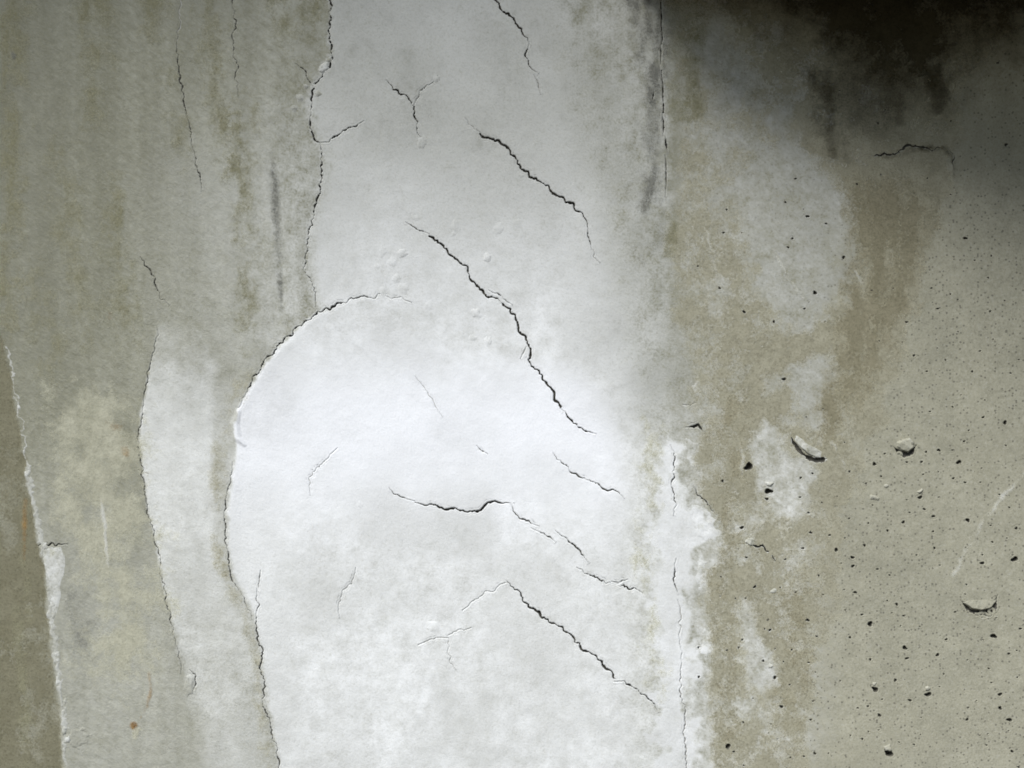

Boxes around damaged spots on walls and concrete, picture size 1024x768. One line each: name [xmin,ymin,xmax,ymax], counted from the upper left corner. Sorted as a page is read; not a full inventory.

water stain [0,0,66,768]
flaking render [5,346,70,767]
water stain [47,386,179,682]
water stain [191,0,259,244]
water stain [270,159,282,258]
crack [236,0,412,409]
crack [403,220,597,437]
crack [386,485,644,595]
crack [463,115,601,265]
crack [417,557,690,768]
spalling [788,434,827,465]
water stain [626,0,1024,768]